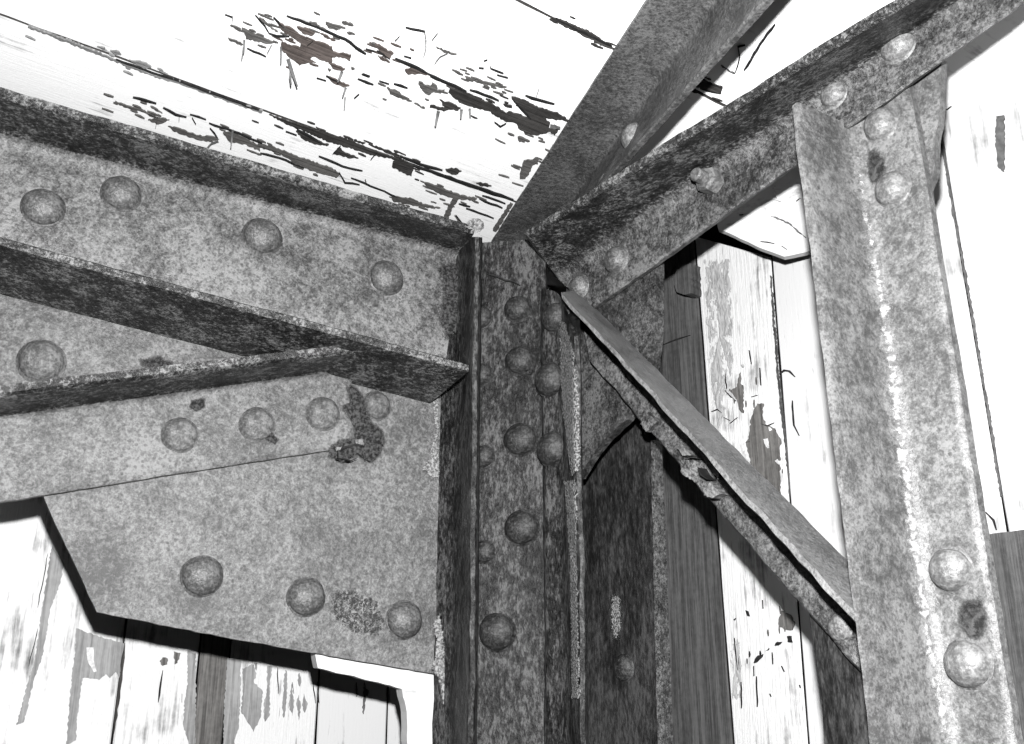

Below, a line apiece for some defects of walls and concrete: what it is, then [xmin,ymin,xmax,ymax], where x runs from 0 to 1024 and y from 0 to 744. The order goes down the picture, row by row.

peeling [549,16,616,50]
peeling [25,11,568,232]
peeling [704,259,783,494]
rust [329,385,384,463]
rust [640,412,661,432]
rust [677,444,728,500]
peeling [16,546,64,725]
rust [331,590,385,636]
peeling [66,628,125,744]
peeling [158,650,196,744]
peeling [223,658,319,744]
peeling [356,682,369,714]